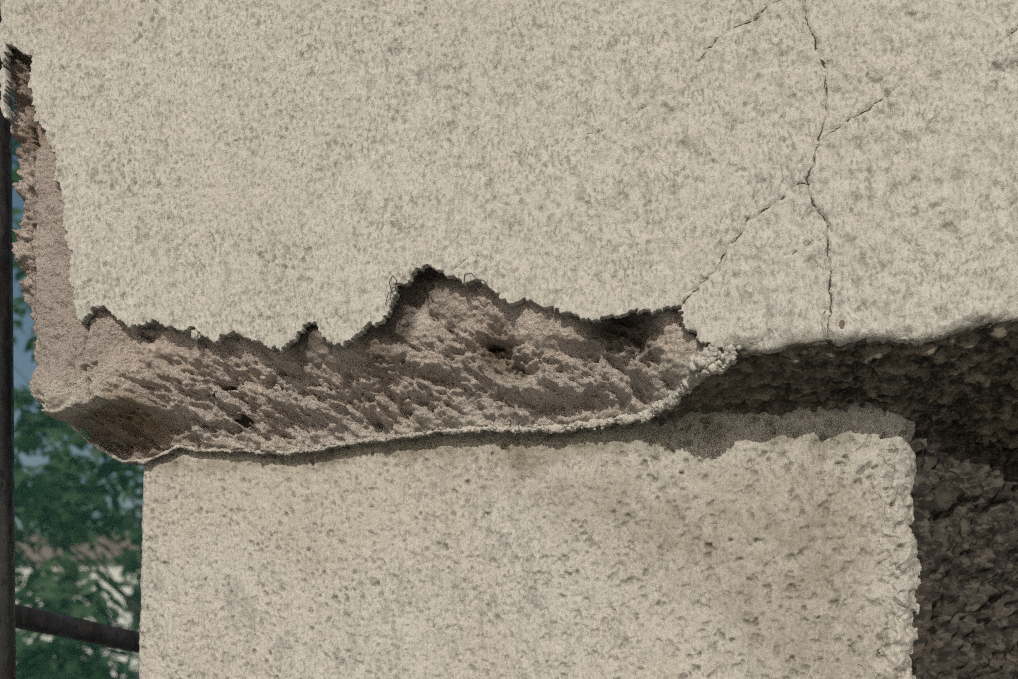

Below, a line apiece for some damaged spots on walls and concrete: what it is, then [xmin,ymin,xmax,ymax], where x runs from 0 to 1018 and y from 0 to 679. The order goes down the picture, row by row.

spalling [9,49,741,466]
crack [683,0,898,350]